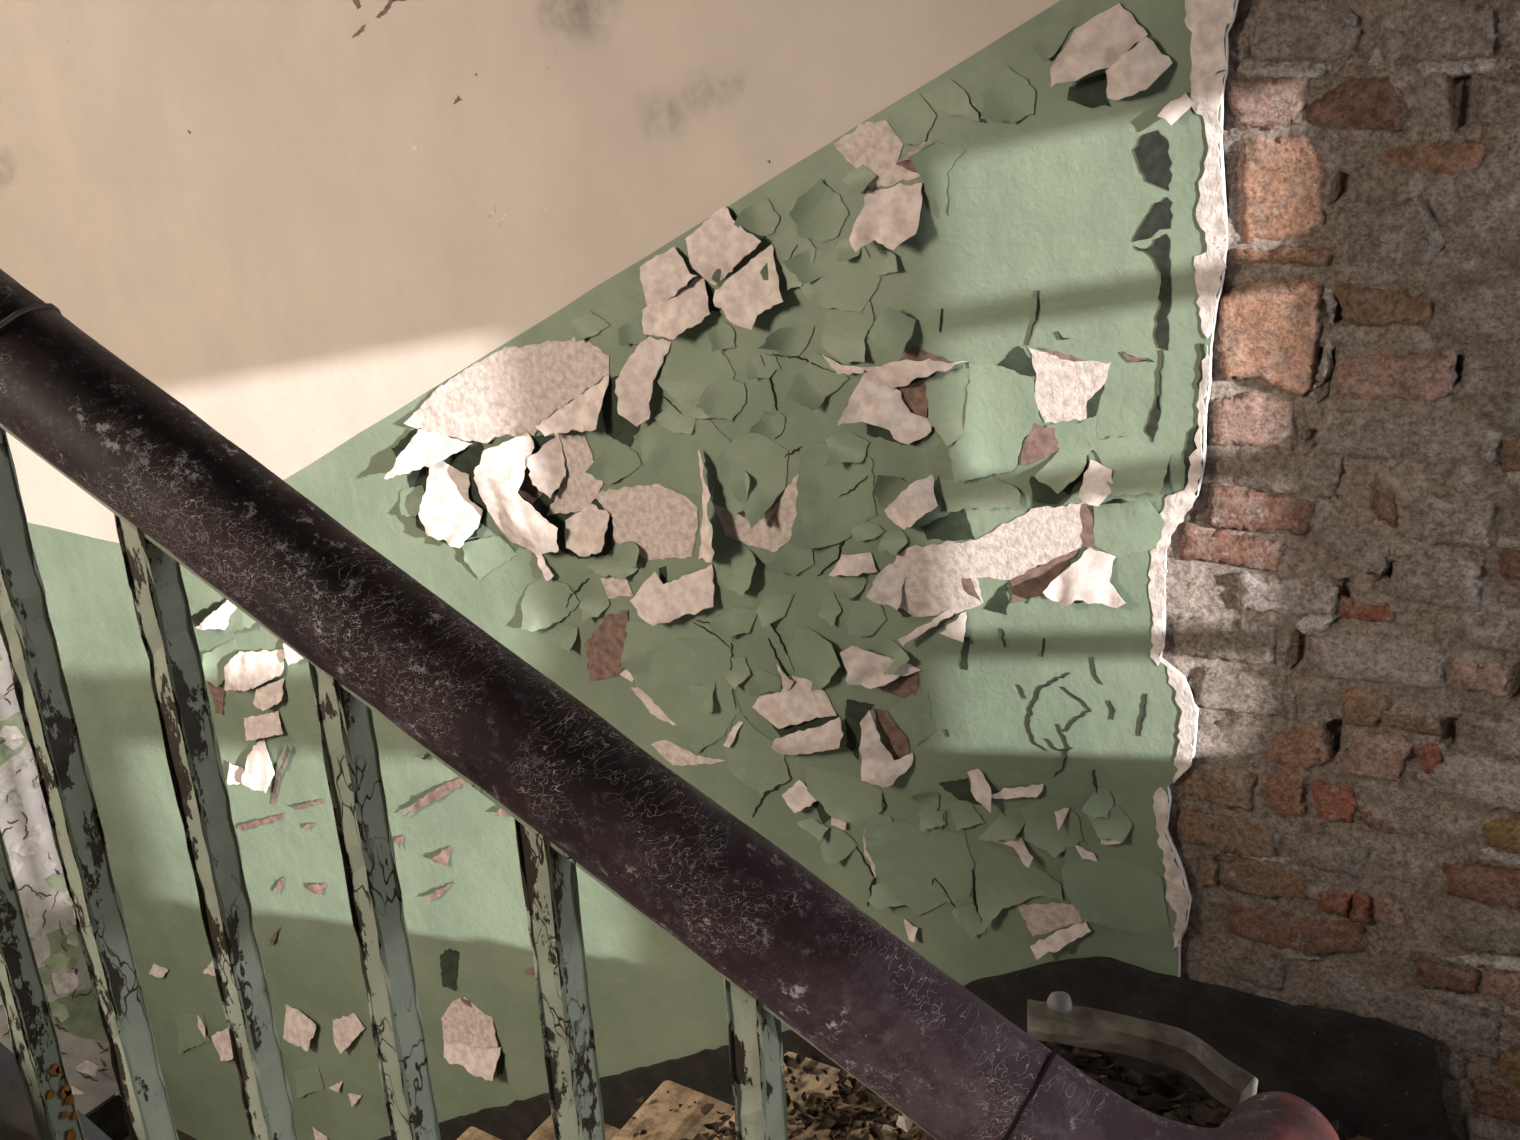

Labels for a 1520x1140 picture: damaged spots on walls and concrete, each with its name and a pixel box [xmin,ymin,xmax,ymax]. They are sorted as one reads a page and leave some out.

flaking render [352,0,406,38]
peeling [384,0,1235,960]
peeling [191,598,324,831]
crack [1018,638,1148,793]
peeling [149,963,169,978]
peeling [175,1012,233,1061]
peeling [203,960,215,976]
peeling [283,1004,365,1107]
peeling [440,948,505,1081]